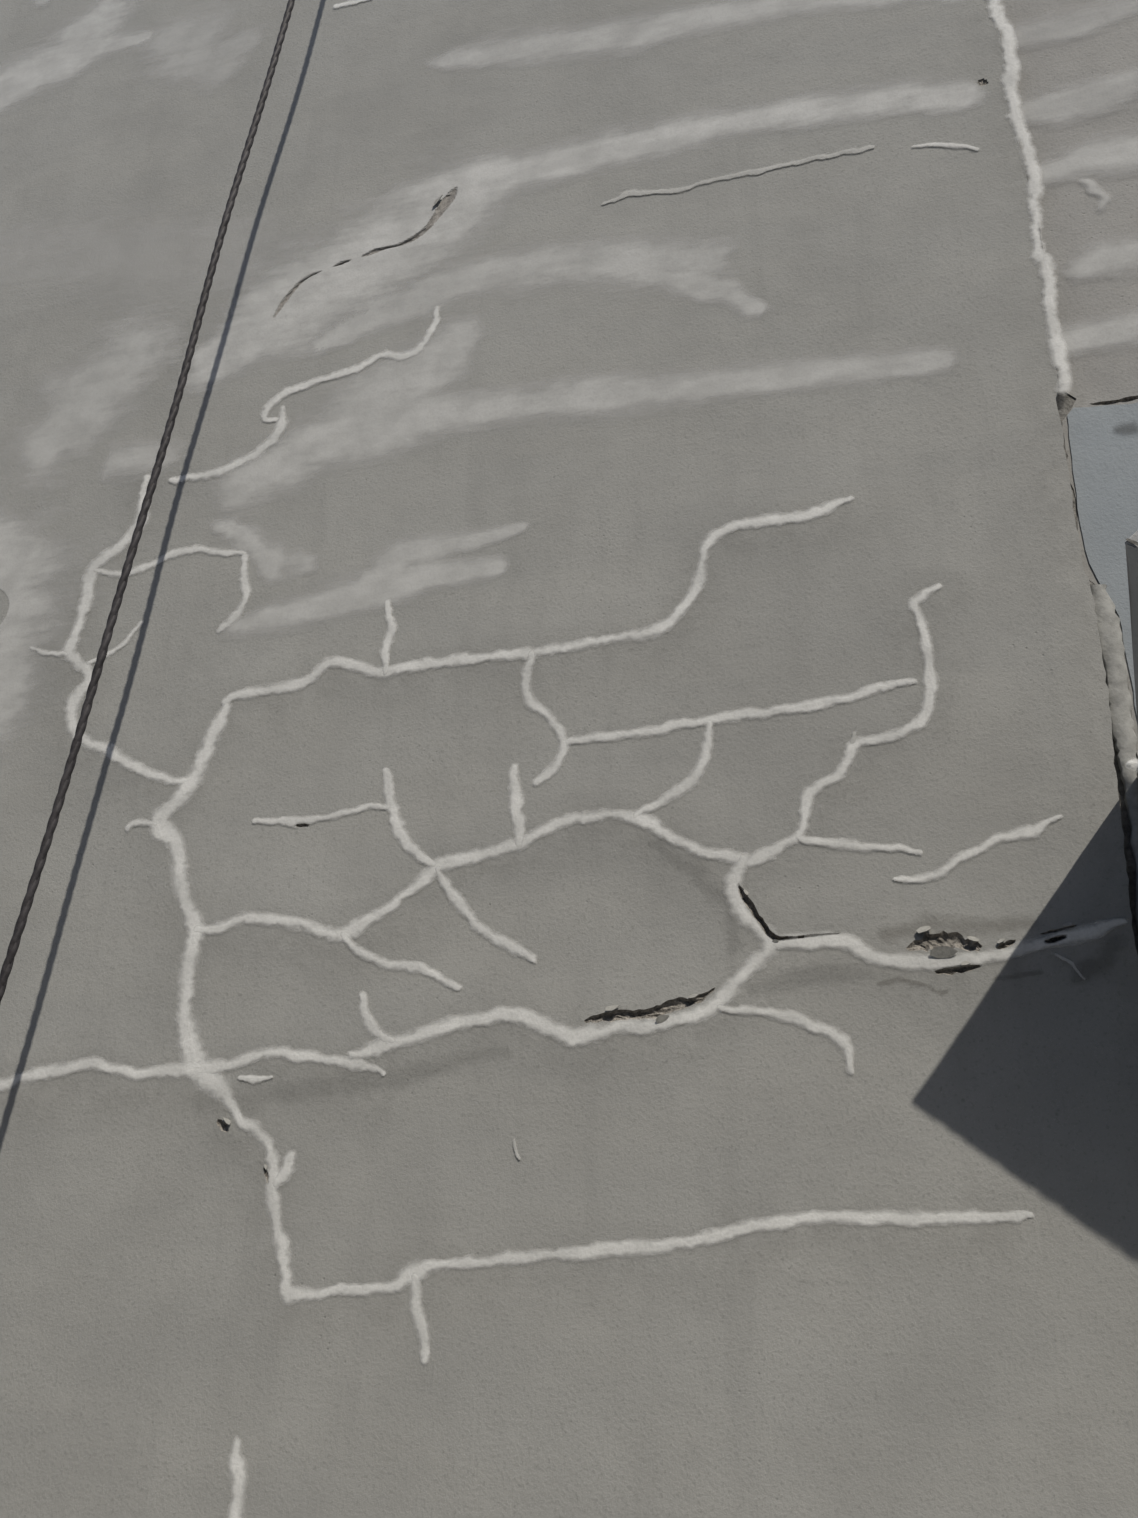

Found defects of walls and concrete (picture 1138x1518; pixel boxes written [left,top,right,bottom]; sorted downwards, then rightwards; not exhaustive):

crack [602,145,875,205]
crack [913,142,979,150]
crack [275,189,457,316]
crack [1089,395,1138,405]
crack [0,306,1127,1364]
crack [229,1438,246,1518]